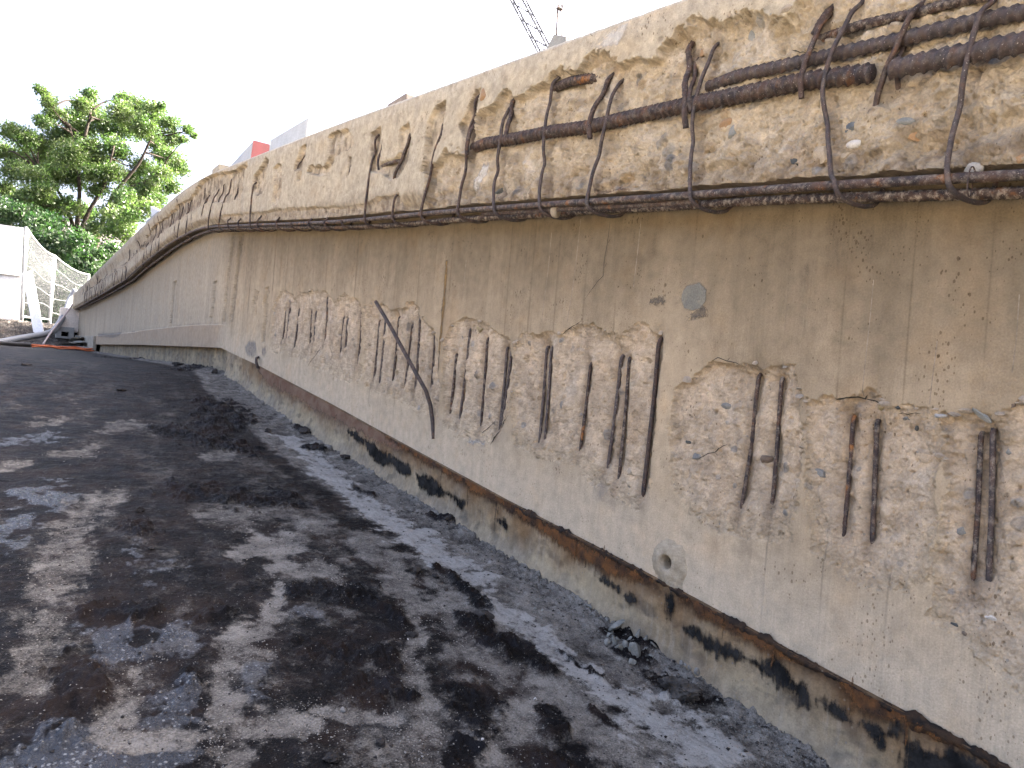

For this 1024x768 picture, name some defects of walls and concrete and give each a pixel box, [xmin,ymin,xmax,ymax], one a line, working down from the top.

rust [438,261,448,364]
spalling [76,0,1024,325]
rust [258,368,657,587]
spalling [252,287,1024,696]